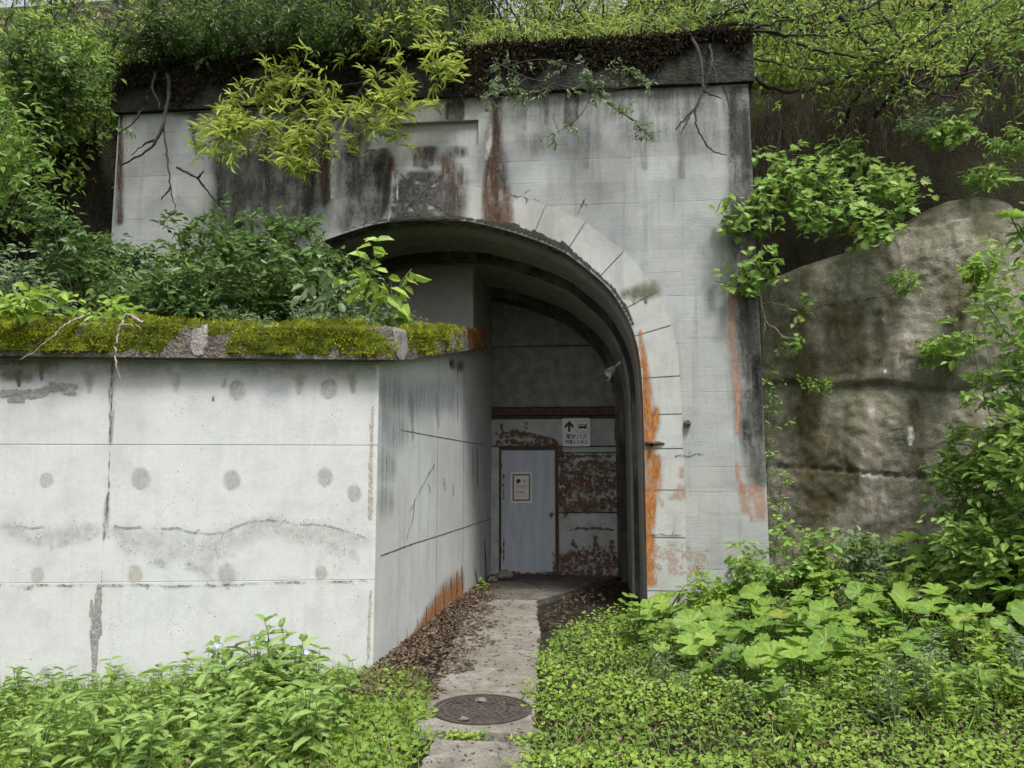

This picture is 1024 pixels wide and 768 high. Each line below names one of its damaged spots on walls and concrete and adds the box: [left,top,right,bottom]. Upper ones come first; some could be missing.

damp [216,104,658,319]
corrosion [483,97,512,228]
damp [729,86,766,488]
corrosion [492,422,618,576]
corrosion [632,330,663,586]
corrosion [736,465,766,521]
corrosion [410,575,463,643]